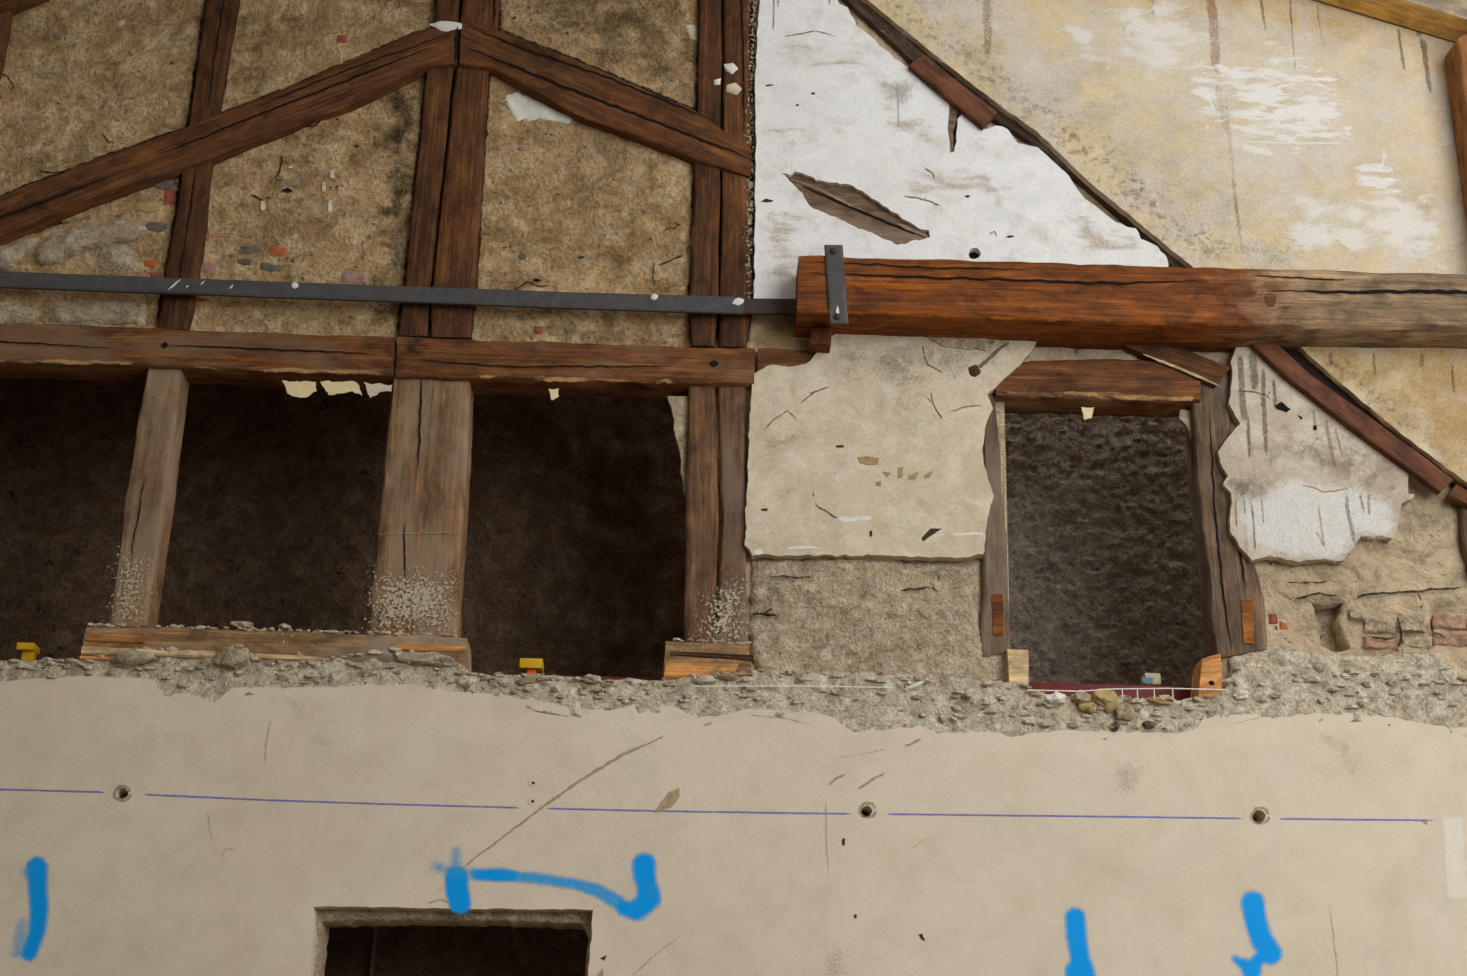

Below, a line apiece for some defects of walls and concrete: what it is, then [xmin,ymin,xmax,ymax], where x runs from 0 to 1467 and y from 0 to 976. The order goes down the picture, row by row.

damp [769,0,934,143]
damp [851,0,1451,270]
spalling [786,174,929,245]
spalling [1275,402,1317,430]
spalling [0,648,1467,740]